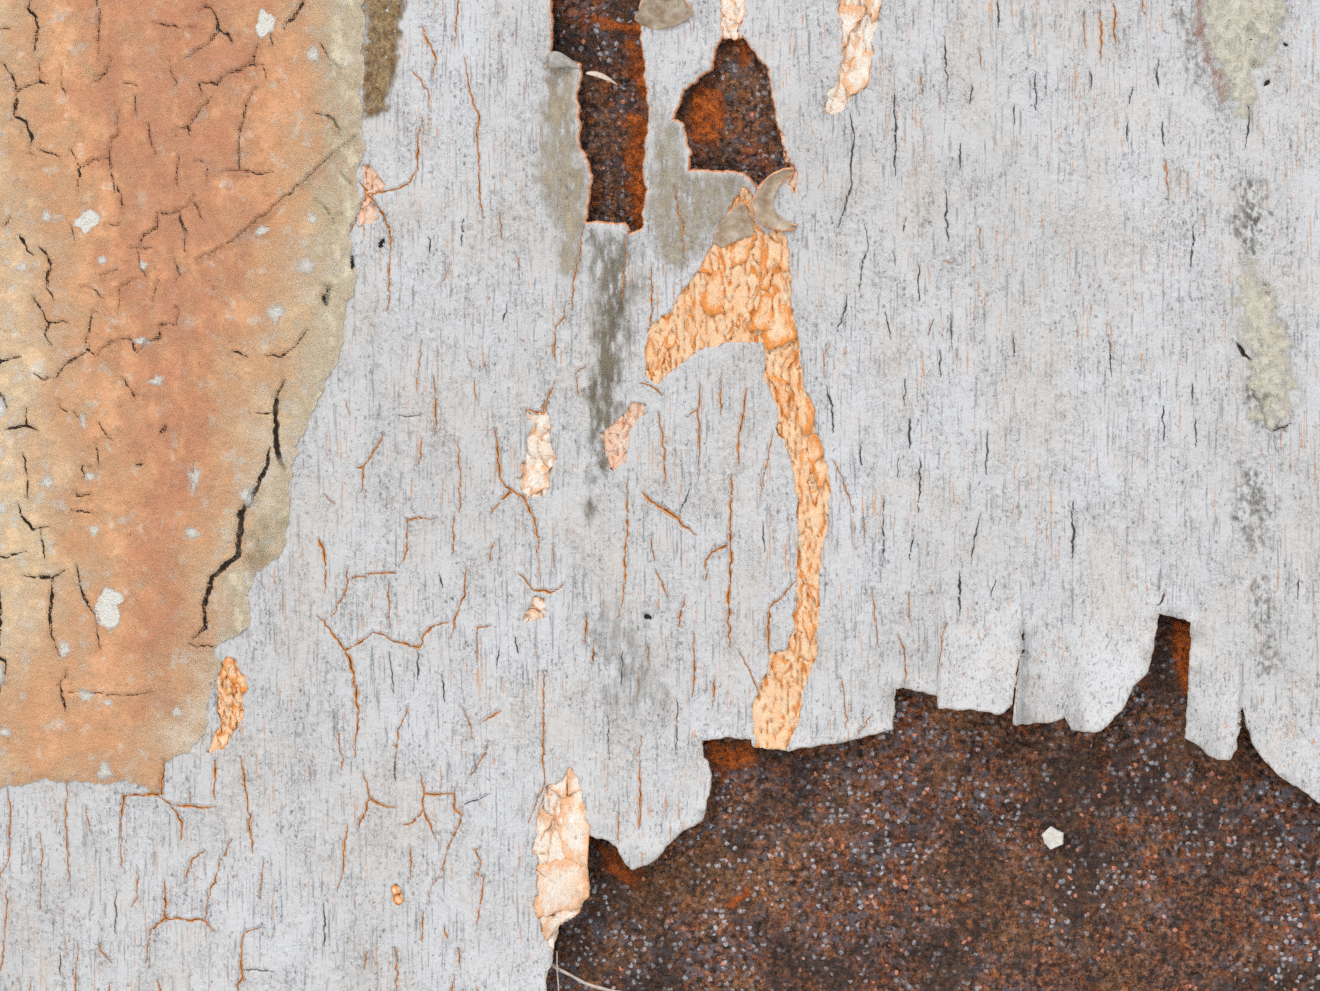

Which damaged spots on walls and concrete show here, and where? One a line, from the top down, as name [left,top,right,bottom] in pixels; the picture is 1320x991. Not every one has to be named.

spalling [255,8,275,38]
spalling [73,210,100,234]
crack [0,0,308,710]
spalling [94,588,124,629]
crack [0,756,273,991]
spalling [207,657,247,753]
spalling [391,884,405,905]
crack [318,341,564,991]
crack [607,716,642,843]
crack [584,381,797,753]
peeling [427,0,1320,991]
corrosion [546,614,1320,991]